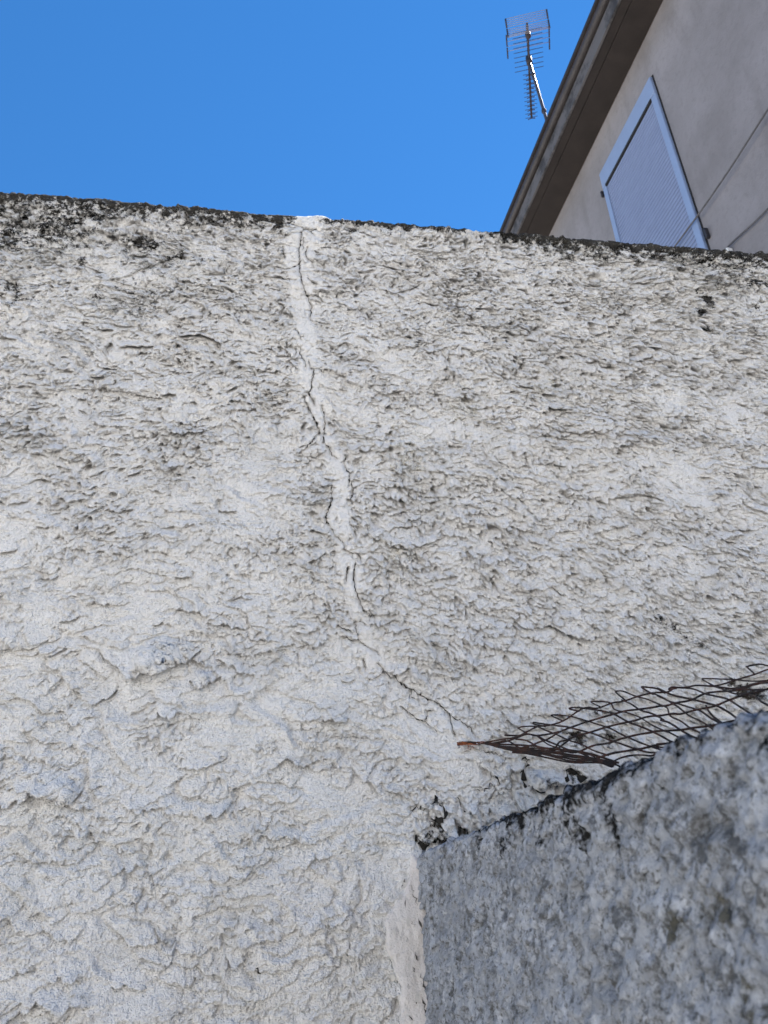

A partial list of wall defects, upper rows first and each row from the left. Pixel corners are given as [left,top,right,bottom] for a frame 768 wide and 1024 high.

crack [277,222,588,793]